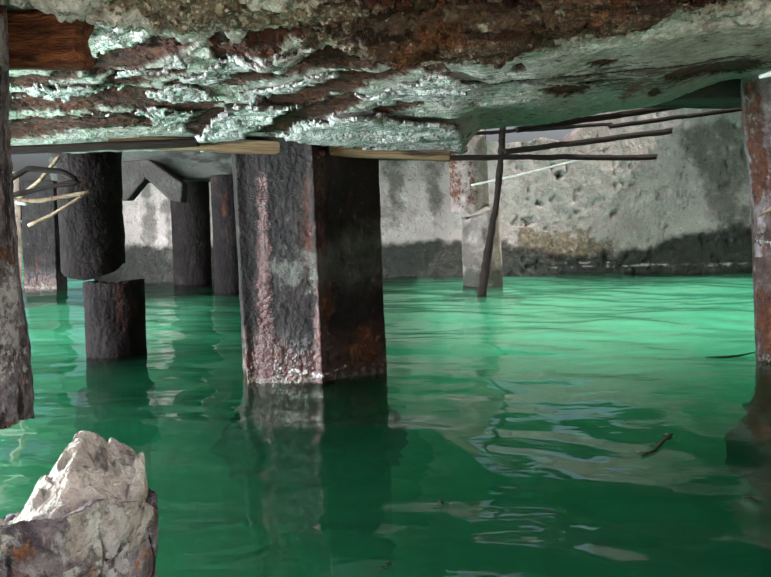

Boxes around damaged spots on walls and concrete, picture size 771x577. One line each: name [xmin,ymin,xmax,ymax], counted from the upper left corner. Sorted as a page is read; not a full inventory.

peeling [239,0,288,13]
corrosion [359,0,417,13]
peeling [0,13,483,155]
corrosion [255,175,273,383]
corrosion [311,149,386,386]
corrosion [756,290,771,355]